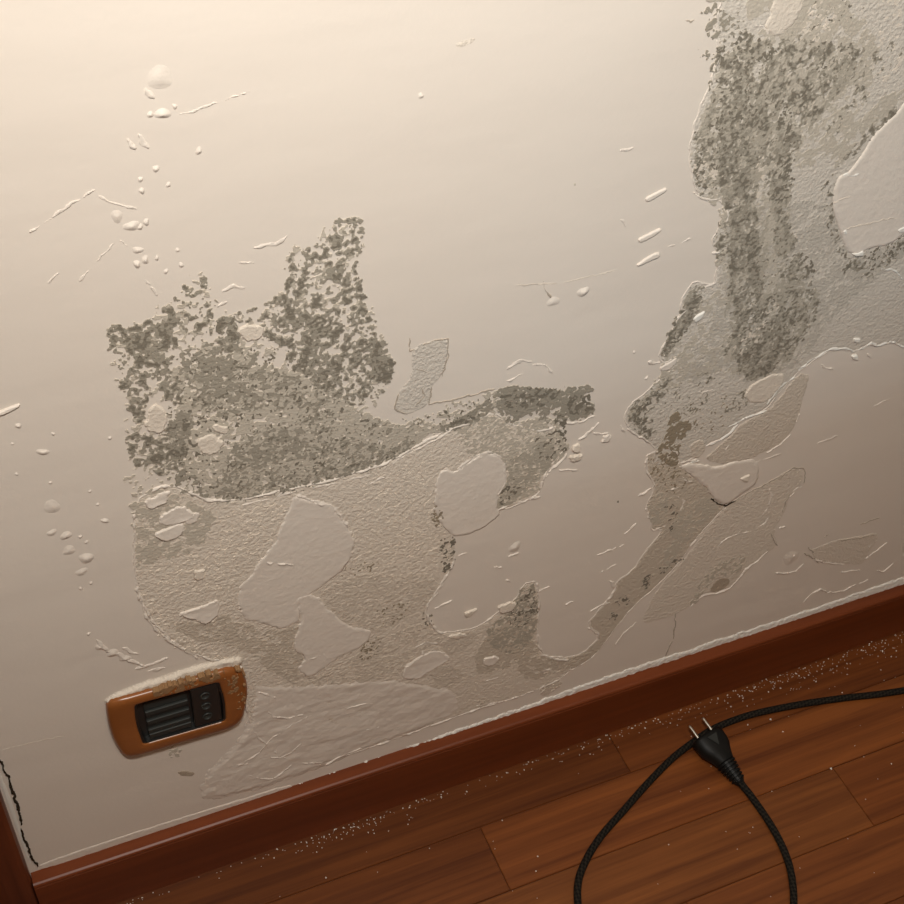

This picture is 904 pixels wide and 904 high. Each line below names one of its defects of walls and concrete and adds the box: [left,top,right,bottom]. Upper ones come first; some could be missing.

water stain [106,217,595,567]
peeling [132,0,904,799]
water stain [627,0,904,589]
crack [0,760,38,867]